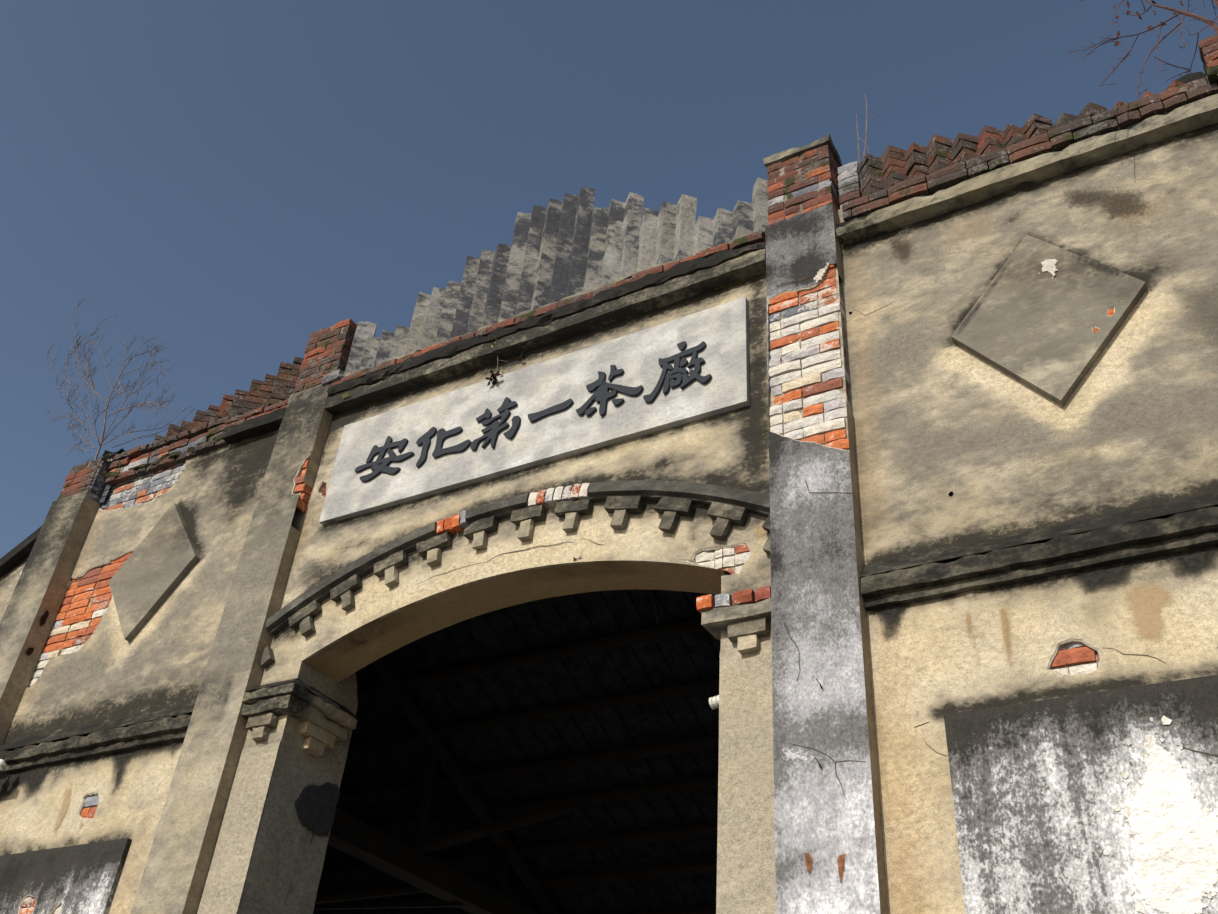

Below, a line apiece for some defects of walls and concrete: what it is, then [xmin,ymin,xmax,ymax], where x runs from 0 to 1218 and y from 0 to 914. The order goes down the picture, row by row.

damp [1070,189,1149,218]
damp [892,240,910,258]
spalling [768,262,851,452]
spalling [99,462,186,511]
spalling [680,543,751,575]
damp [1169,544,1218,575]
damp [1079,561,1168,637]
spalling [26,550,134,688]
damp [880,603,906,637]
spalling [1047,639,1101,676]
peeling [1113,715,1218,914]
corrosion [837,854,845,883]